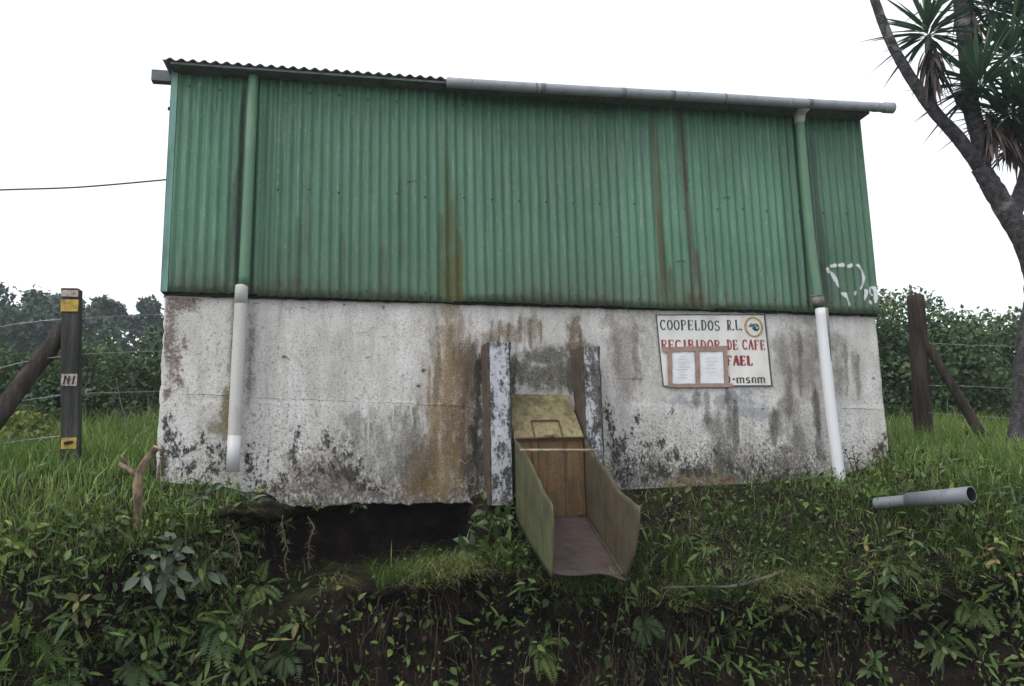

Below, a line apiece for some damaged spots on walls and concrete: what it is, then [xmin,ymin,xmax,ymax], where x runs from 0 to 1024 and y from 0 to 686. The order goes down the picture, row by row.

leakage [157,387,230,481]
leakage [244,425,386,501]
rust [410,256,464,498]
peeling [488,338,514,504]
peeling [583,346,603,454]
leakage [603,389,826,488]